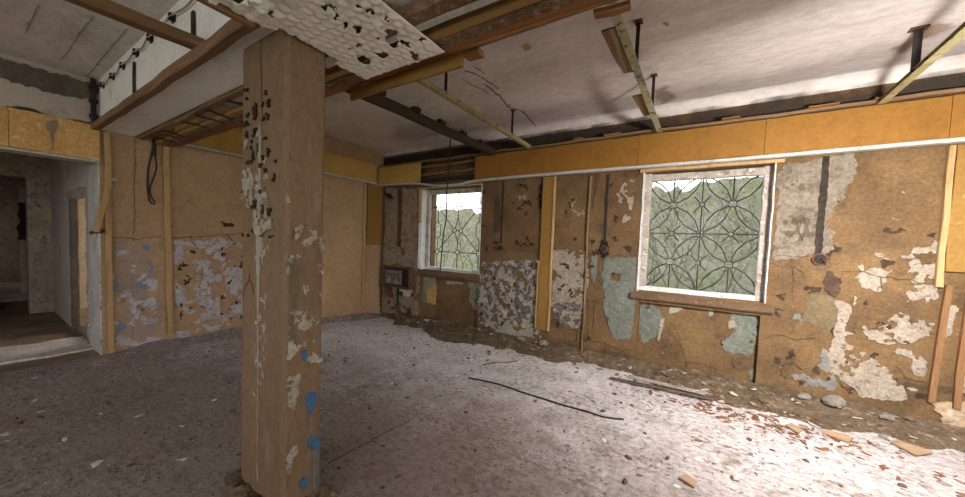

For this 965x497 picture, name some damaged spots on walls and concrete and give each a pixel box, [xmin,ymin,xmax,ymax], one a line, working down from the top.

flaking render [0,57,99,99]
crack [462,67,536,126]
peeling [114,88,277,349]
peeling [609,179,635,224]
peeling [286,224,325,275]
peeling [381,184,546,338]
peeling [551,236,683,343]
flaking render [772,153,965,428]
peeling [287,310,323,365]
peeling [722,312,758,379]
peeling [287,373,301,410]
peeling [285,445,299,474]